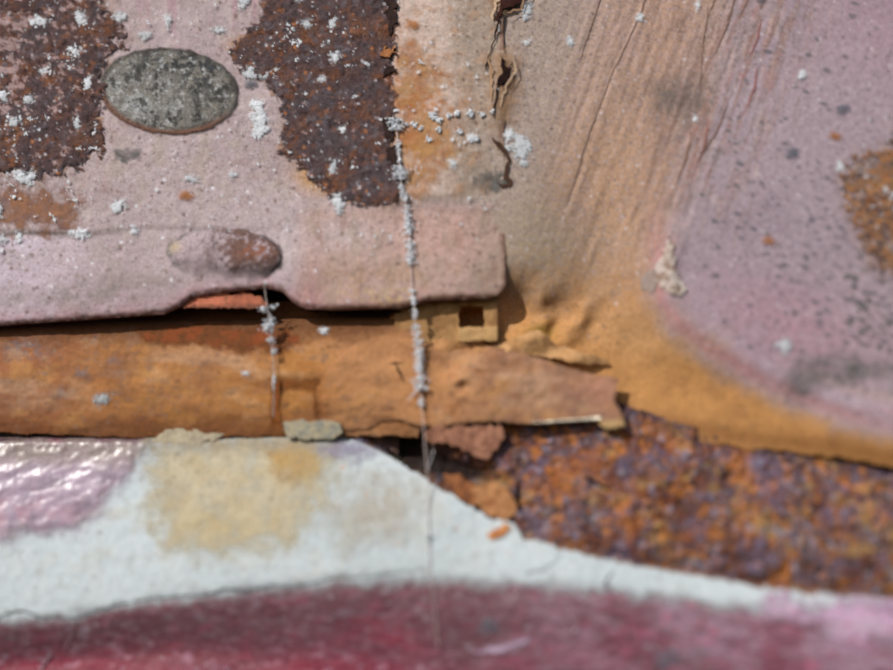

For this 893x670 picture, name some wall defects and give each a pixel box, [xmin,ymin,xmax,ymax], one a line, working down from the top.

corrosion [0,0,130,239]
corrosion [229,0,451,208]
peeling [639,235,687,296]
corrosion [839,138,893,281]
corrosion [139,324,299,353]
corrosion [271,379,321,424]
crack [0,568,429,619]
peeling [0,419,893,657]
corrosion [328,402,893,599]